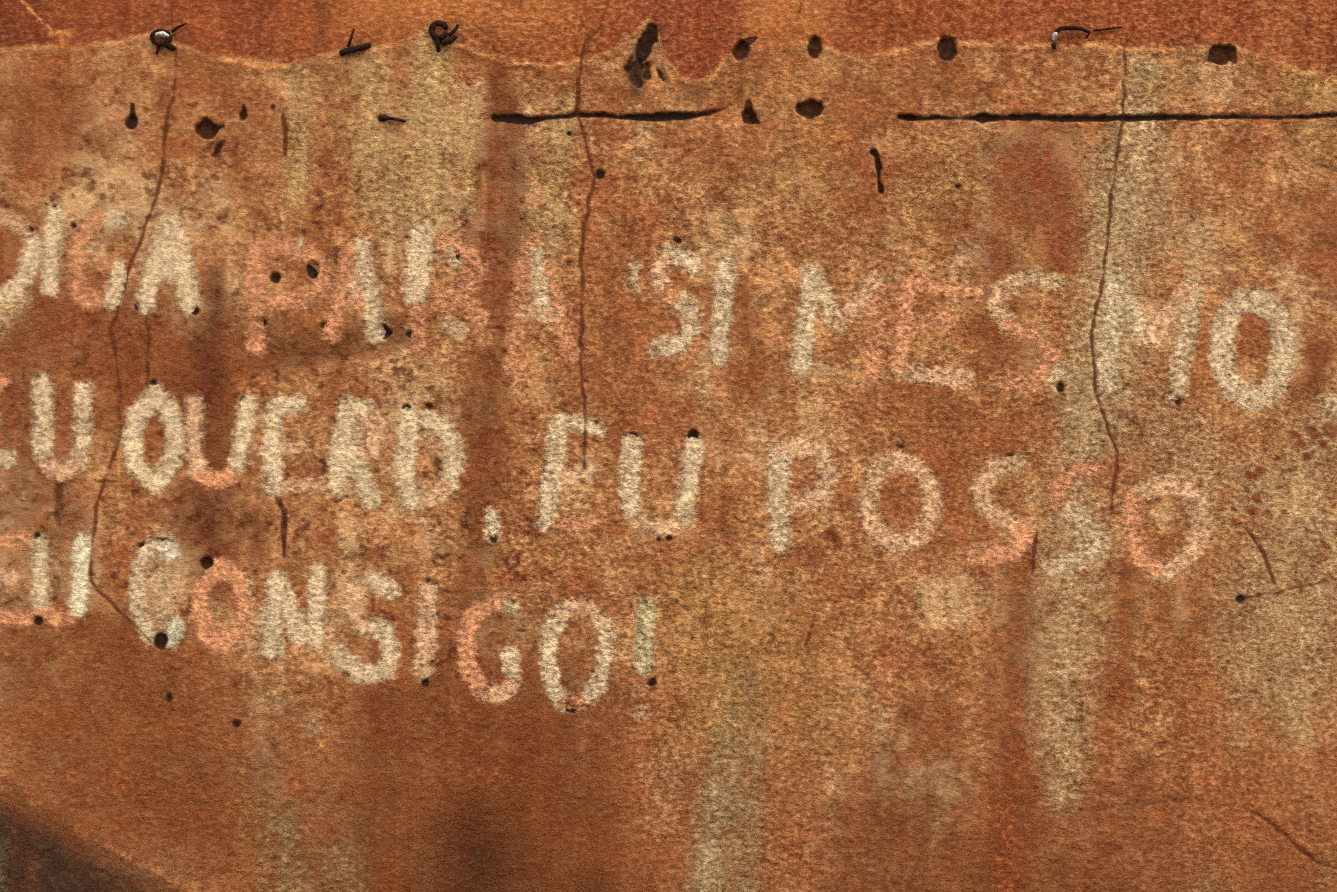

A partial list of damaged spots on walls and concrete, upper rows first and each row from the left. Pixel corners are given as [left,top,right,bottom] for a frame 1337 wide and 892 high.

crack [492,49,723,469]
rust [945,122,1080,266]
crack [897,49,1337,511]
rust [275,495,287,558]
rust [826,528,843,547]
rust [1222,495,1287,525]
rust [1248,424,1337,479]
rust [1102,568,1138,712]
damp [0,627,243,862]
damp [324,642,600,892]
rust [992,555,1042,892]
damp [255,808,311,892]